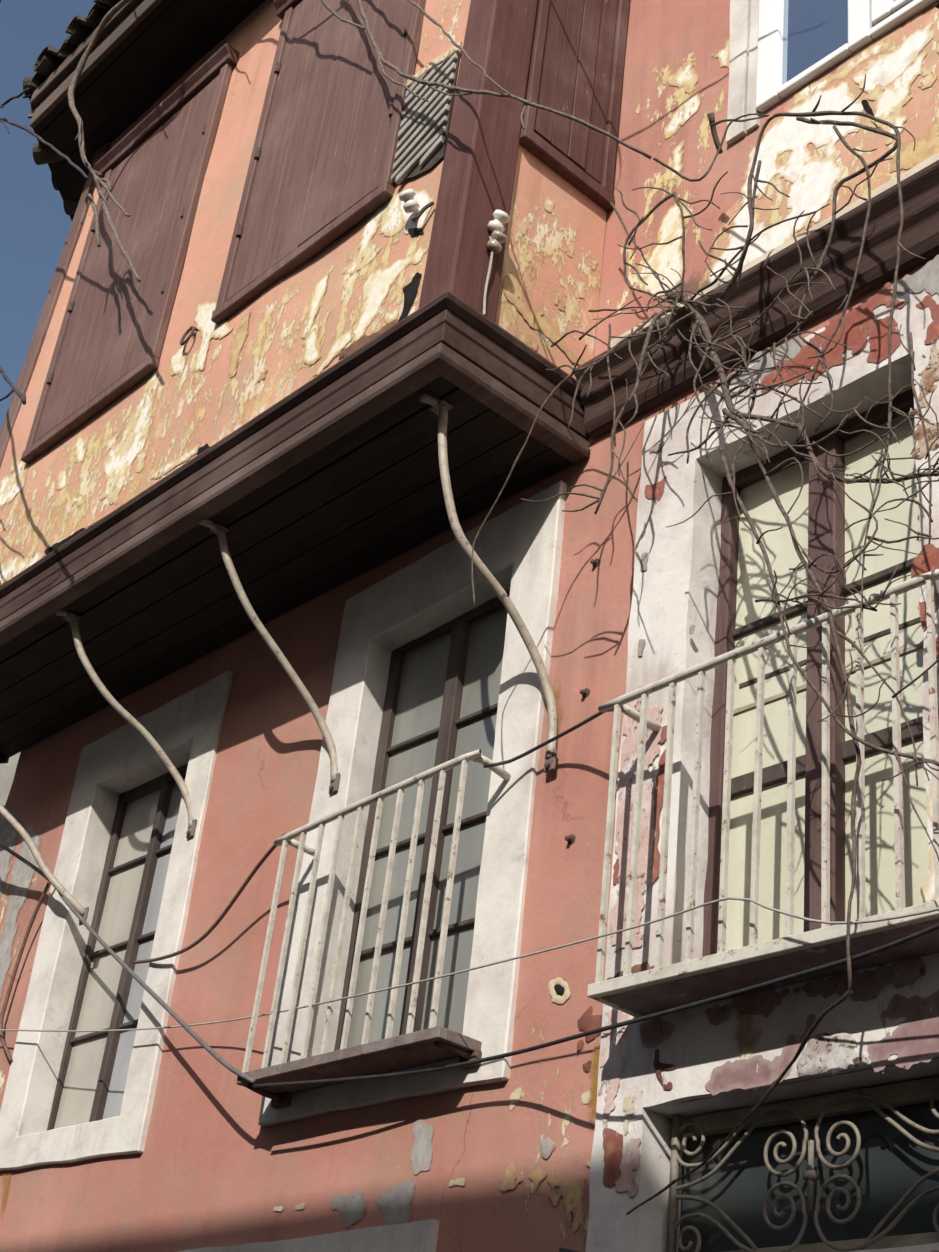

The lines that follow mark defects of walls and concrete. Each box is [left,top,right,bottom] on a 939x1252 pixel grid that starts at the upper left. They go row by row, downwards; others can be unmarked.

peeling [500,0,939,365]
peeling [0,0,468,585]
peeling [759,282,939,458]
peeling [911,543,939,670]
peeling [919,786,935,903]
peeling [705,957,939,1097]
peeling [449,1178,465,1187]